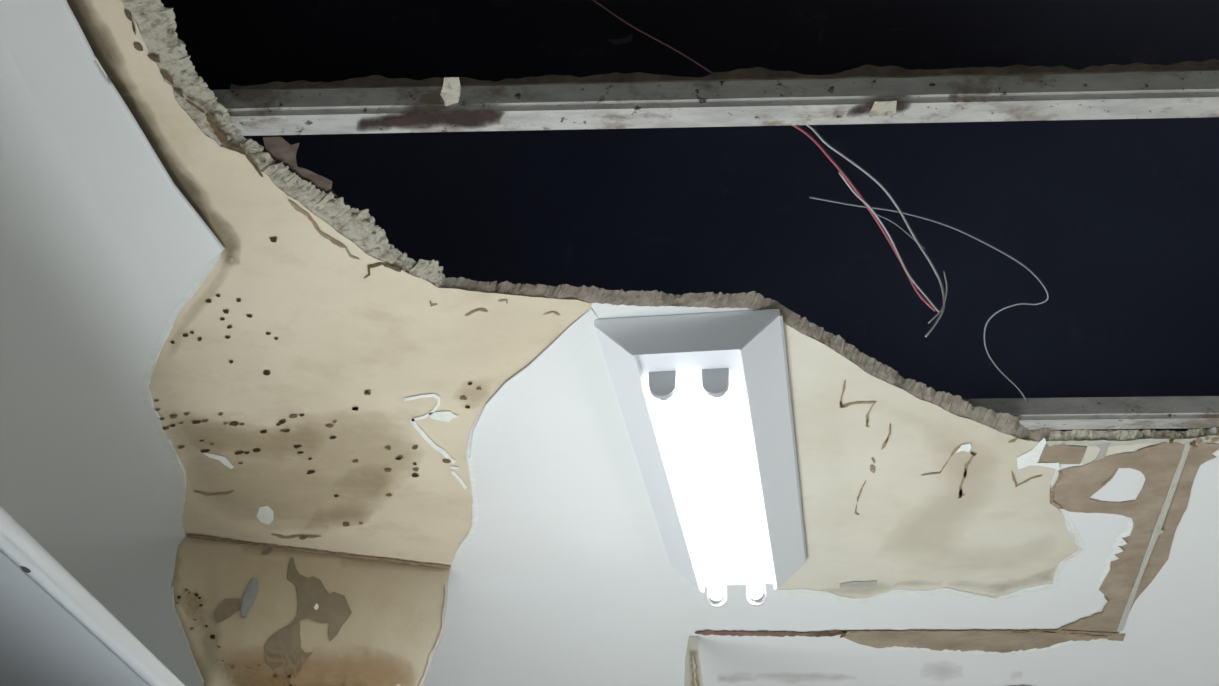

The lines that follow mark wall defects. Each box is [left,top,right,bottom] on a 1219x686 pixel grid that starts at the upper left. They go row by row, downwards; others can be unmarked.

peeling [81,0,1219,569]
damp [205,295,252,339]
mould [154,400,245,430]
mould [260,414,315,474]
damp [384,445,419,477]
peeling [171,537,450,686]